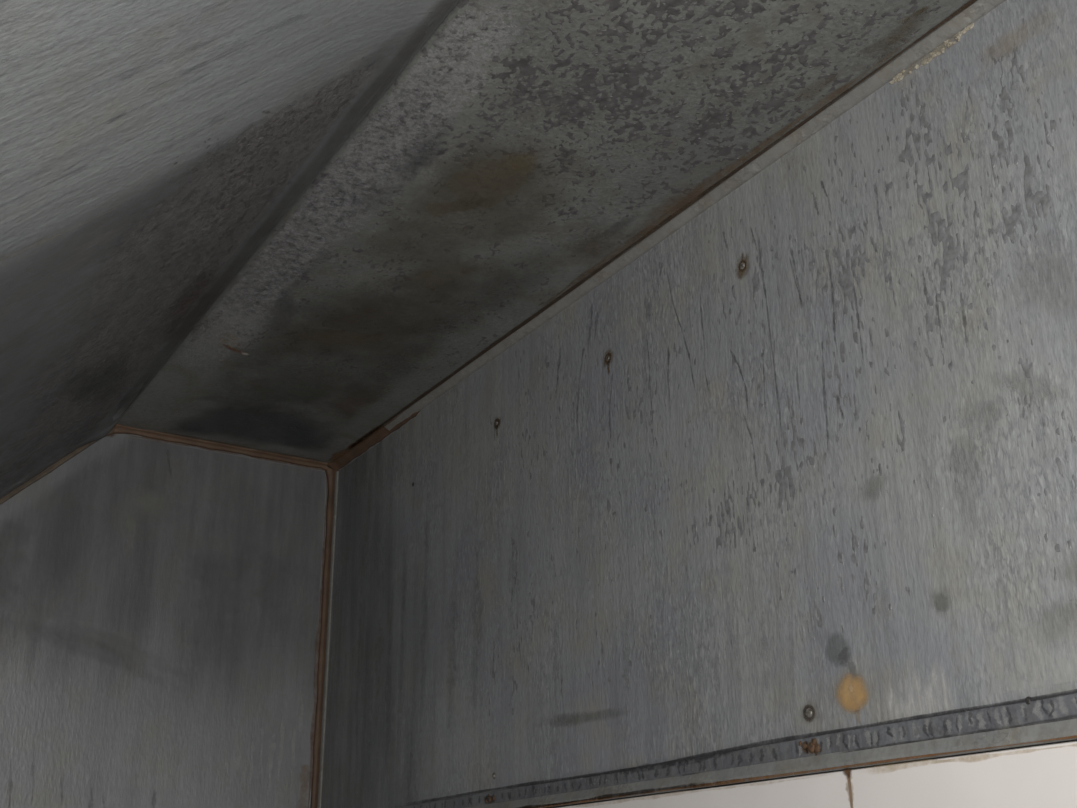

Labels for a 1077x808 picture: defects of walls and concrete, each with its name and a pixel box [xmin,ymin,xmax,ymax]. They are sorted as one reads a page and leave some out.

leakage [166,12,513,355]
rust [840,677,867,710]